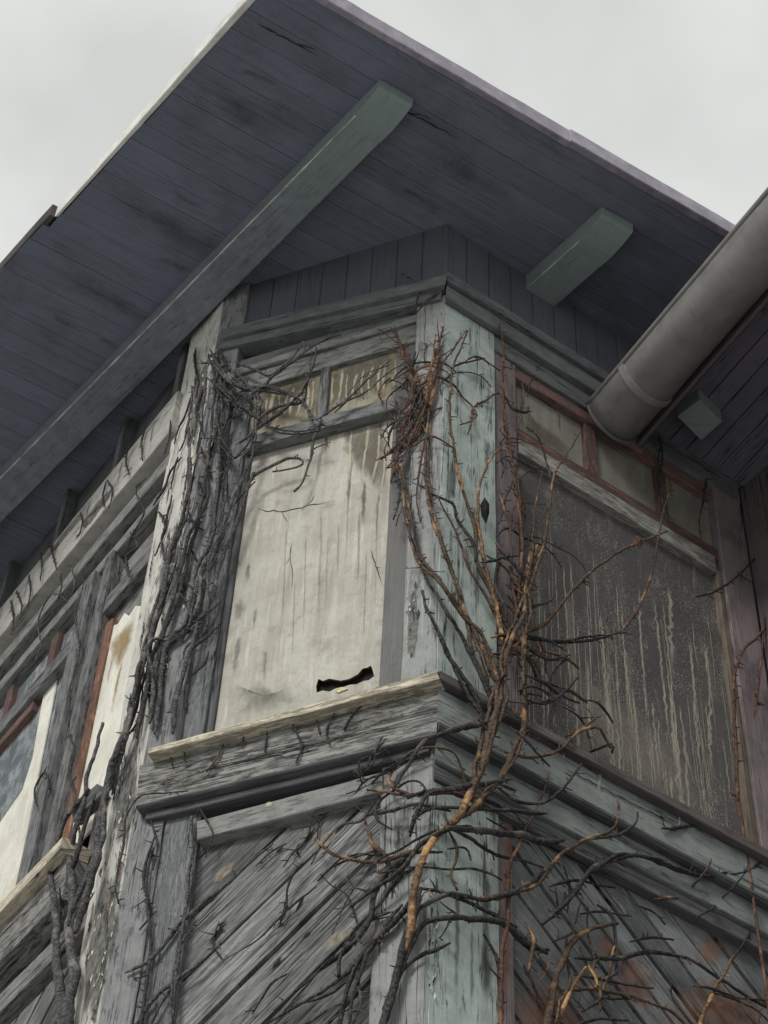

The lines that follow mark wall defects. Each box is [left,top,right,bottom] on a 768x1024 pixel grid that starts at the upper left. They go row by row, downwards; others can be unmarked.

crack [257,23,314,53]
crack [407,112,457,138]
water stain [331,357,396,398]
water stain [261,381,314,422]
water stain [326,423,387,514]
spalling [316,666,374,693]
water stain [526,571,733,818]